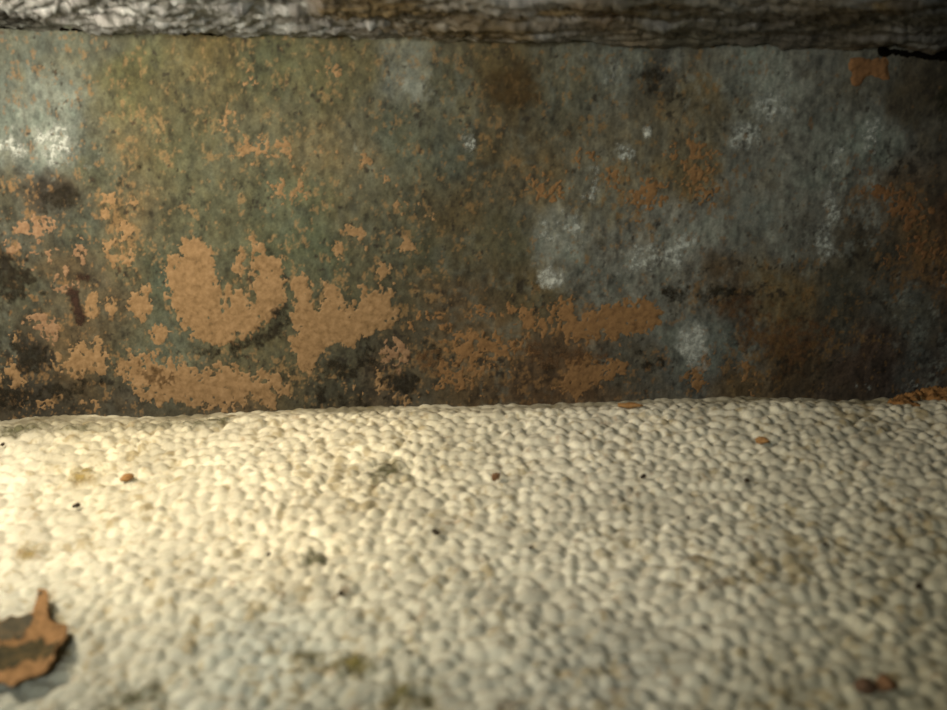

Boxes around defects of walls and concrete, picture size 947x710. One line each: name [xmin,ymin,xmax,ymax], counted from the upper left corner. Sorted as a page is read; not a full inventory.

efflorescence [0,127,25,156]
efflorescence [35,126,69,165]
efflorescence [629,235,696,268]
mould [0,251,44,303]
damp [539,270,562,287]
mould [662,285,751,303]
peeling [0,213,663,413]
mould [199,307,289,355]
mould [379,367,420,399]